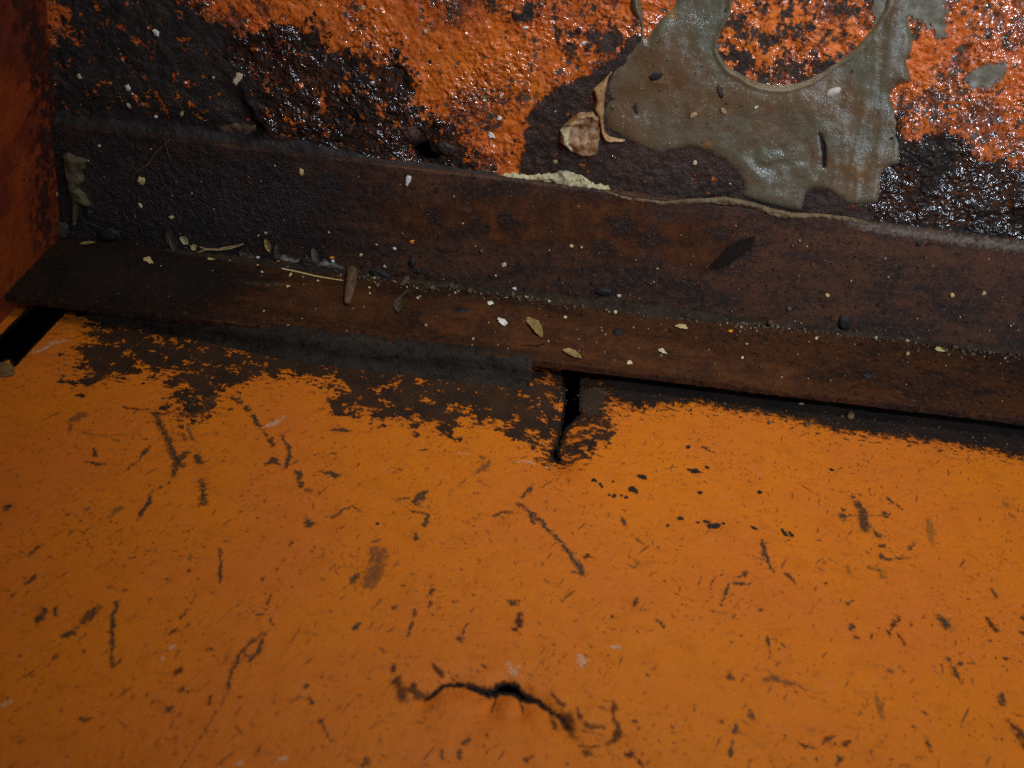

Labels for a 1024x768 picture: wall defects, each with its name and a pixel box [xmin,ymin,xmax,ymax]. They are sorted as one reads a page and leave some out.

rust [4,0,499,250]
spalling [412,138,445,162]
peeling [558,111,601,156]
rust [517,21,1024,239]
rust [649,217,733,273]
rust [51,294,1024,470]
crack [425,671,571,728]